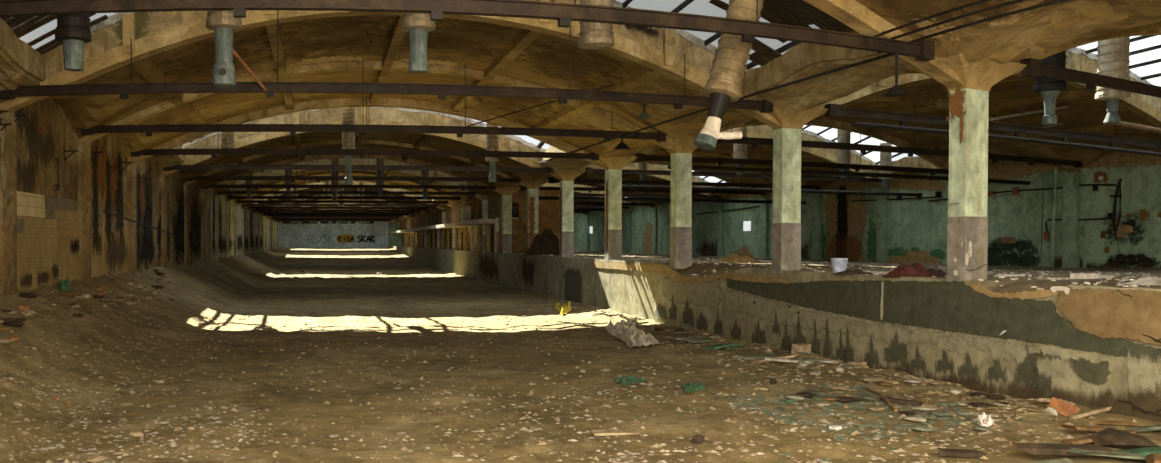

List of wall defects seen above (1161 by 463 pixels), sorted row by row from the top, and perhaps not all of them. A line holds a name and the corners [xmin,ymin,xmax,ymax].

leakage [70,147,262,273]
peeling [866,220,877,262]
leakage [987,239,1040,267]
flaking render [953,241,1161,346]
spalling [1100,215,1145,244]
leakage [655,277,1161,422]